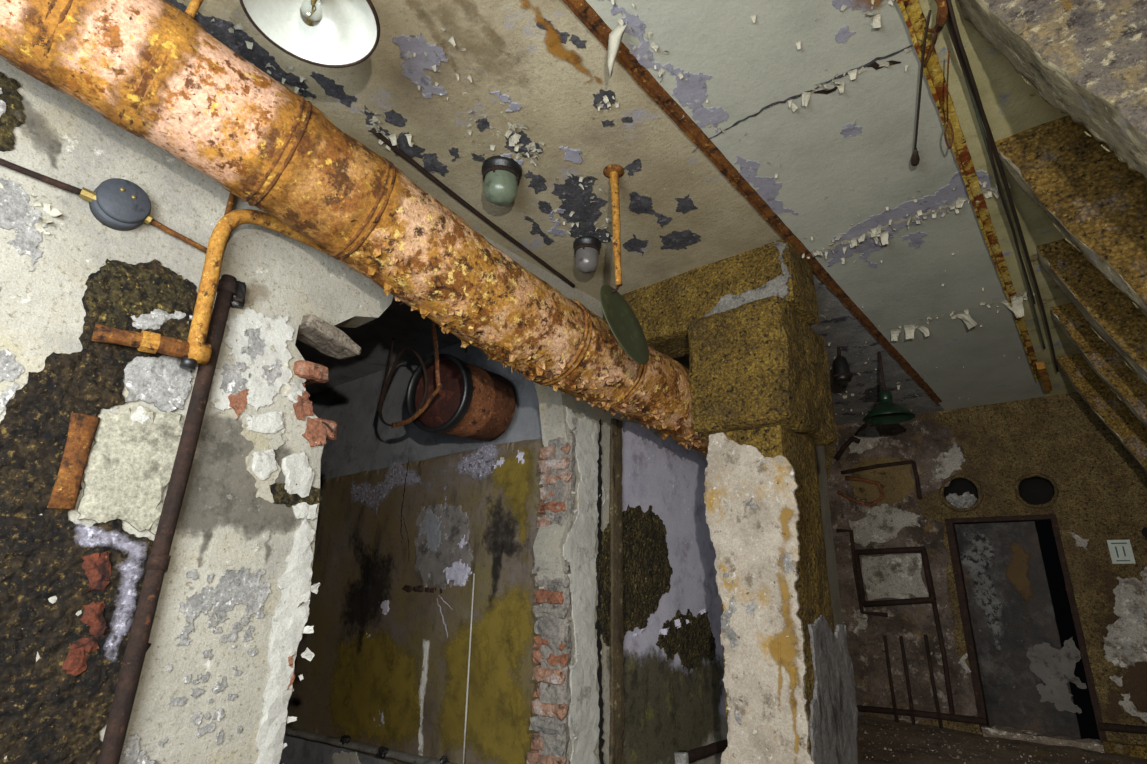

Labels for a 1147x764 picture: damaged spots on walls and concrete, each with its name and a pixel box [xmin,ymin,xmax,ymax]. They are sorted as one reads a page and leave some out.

peeling [163,0,701,256]
rust [522,0,601,83]
peeling [601,0,729,133]
crack [692,39,927,153]
peeling [0,177,62,272]
spalling [704,241,793,317]
peeling [734,156,798,216]
peeling [795,170,1011,269]
spalling [0,259,198,764]
peeling [931,446,966,479]
rust [770,507,799,753]
peeling [1103,566,1147,722]